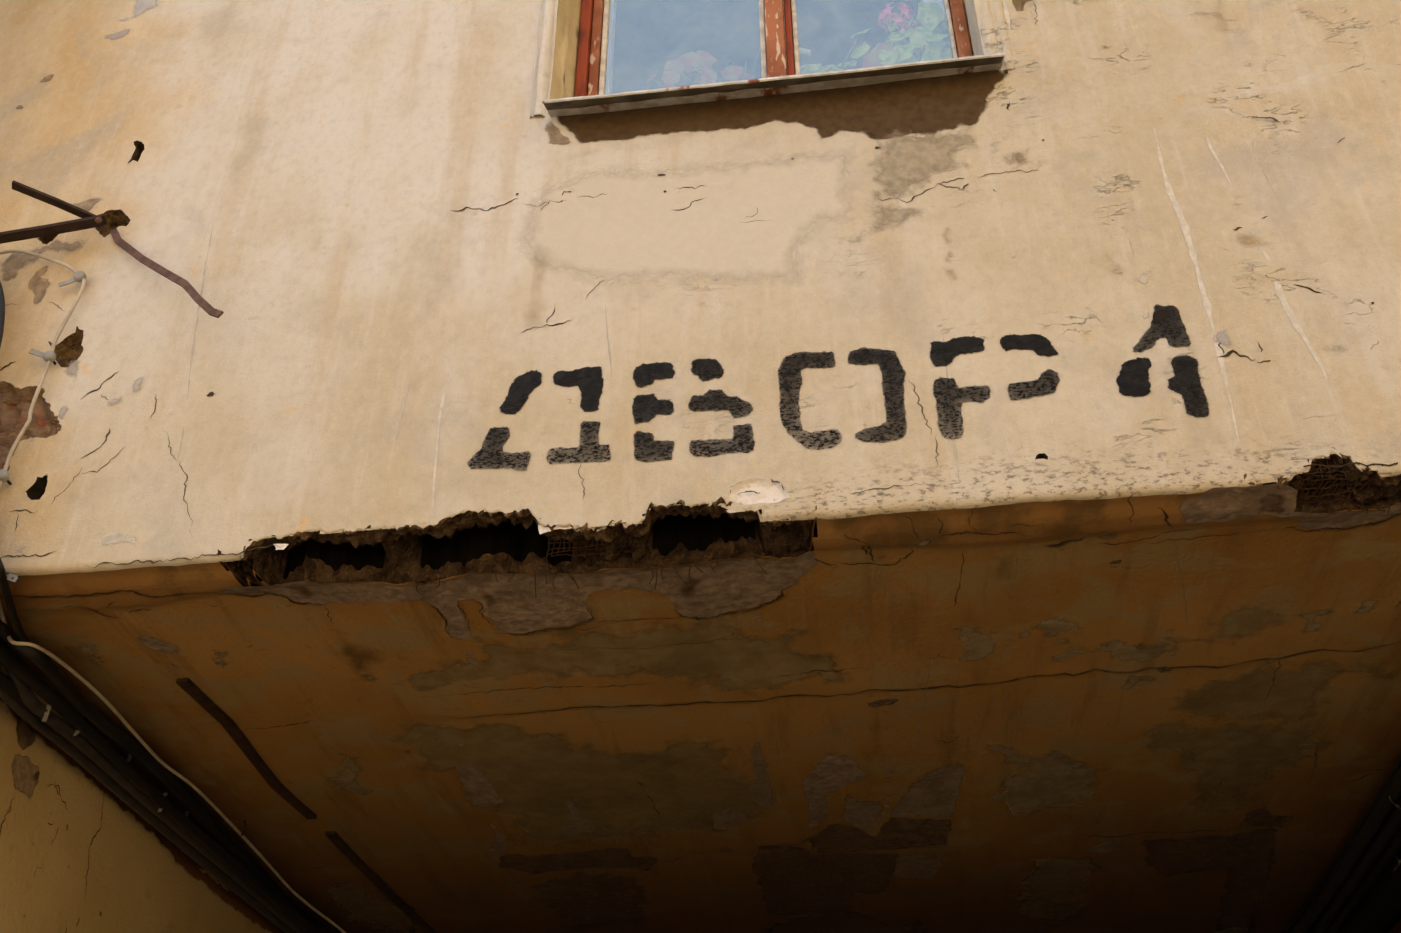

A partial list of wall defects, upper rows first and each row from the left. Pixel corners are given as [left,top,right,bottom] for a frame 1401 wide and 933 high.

spalling [1008,0,1039,14]
crack [451,191,603,211]
crack [875,169,1037,203]
spalling [45,324,88,375]
spalling [0,378,67,487]
spalling [21,471,52,504]
crack [1,370,333,623]
spalling [1180,447,1401,529]
spalling [218,475,818,665]
crack [423,380,1400,719]
crack [65,797,104,933]